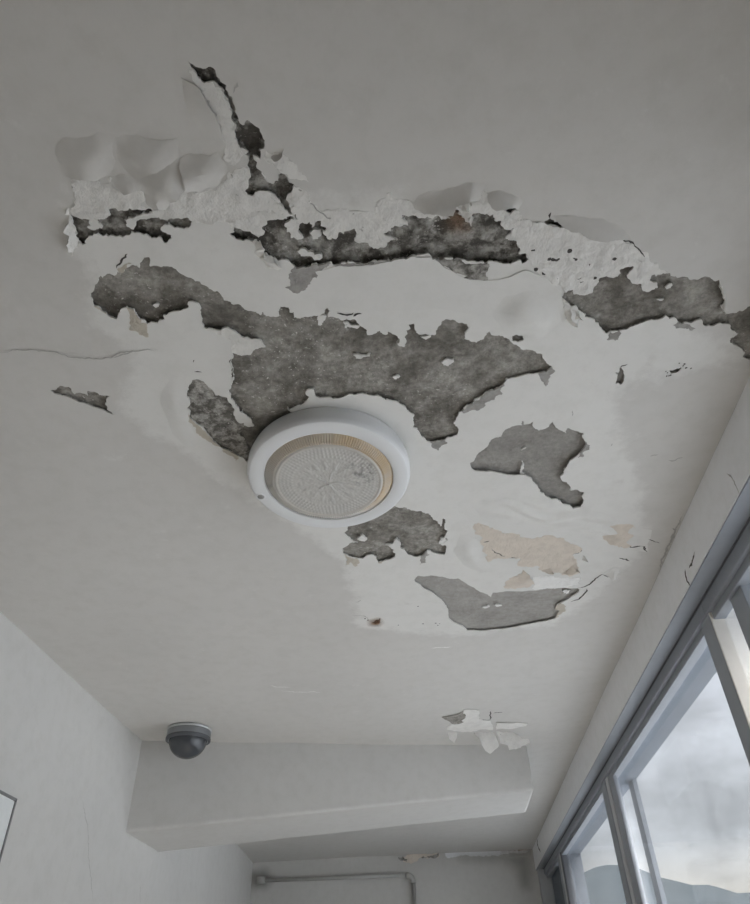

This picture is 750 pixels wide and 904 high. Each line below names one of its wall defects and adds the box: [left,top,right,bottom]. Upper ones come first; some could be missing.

spalling [52,63,750,461]
crack [3,349,154,360]
spalling [470,421,590,507]
spalling [343,506,447,567]
spalling [415,523,588,630]
peeling [442,709,530,754]